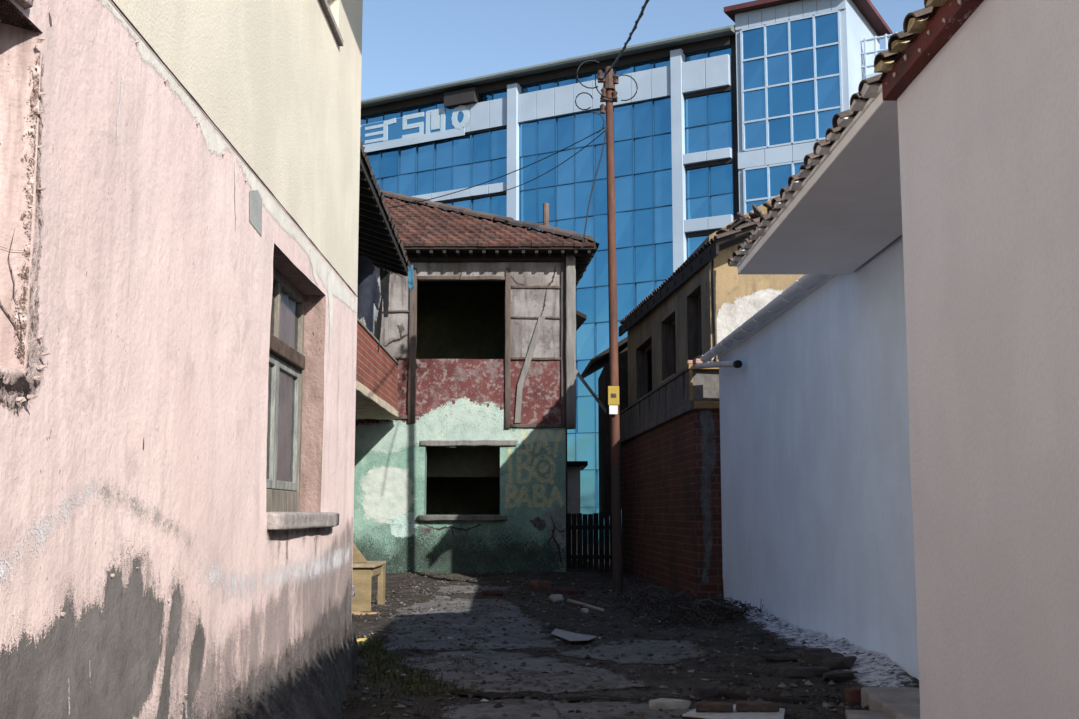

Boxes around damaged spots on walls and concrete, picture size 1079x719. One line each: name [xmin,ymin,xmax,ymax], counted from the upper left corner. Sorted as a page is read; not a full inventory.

spalling [0,38,51,414]
flaking render [93,0,356,314]
water stain [181,509,566,719]
peeling [354,397,565,538]
crack [547,515,564,563]